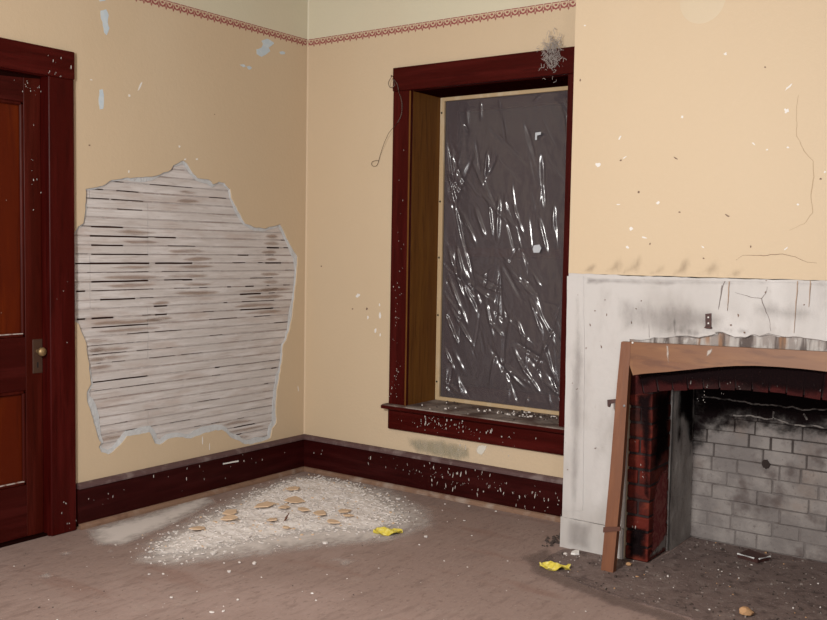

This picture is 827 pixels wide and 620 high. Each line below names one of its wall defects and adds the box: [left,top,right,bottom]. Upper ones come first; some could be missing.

peeling [99,0,109,35]
peeling [256,39,274,57]
crack [791,95,814,230]
flaking render [75,159,297,454]
crack [675,281,826,342]